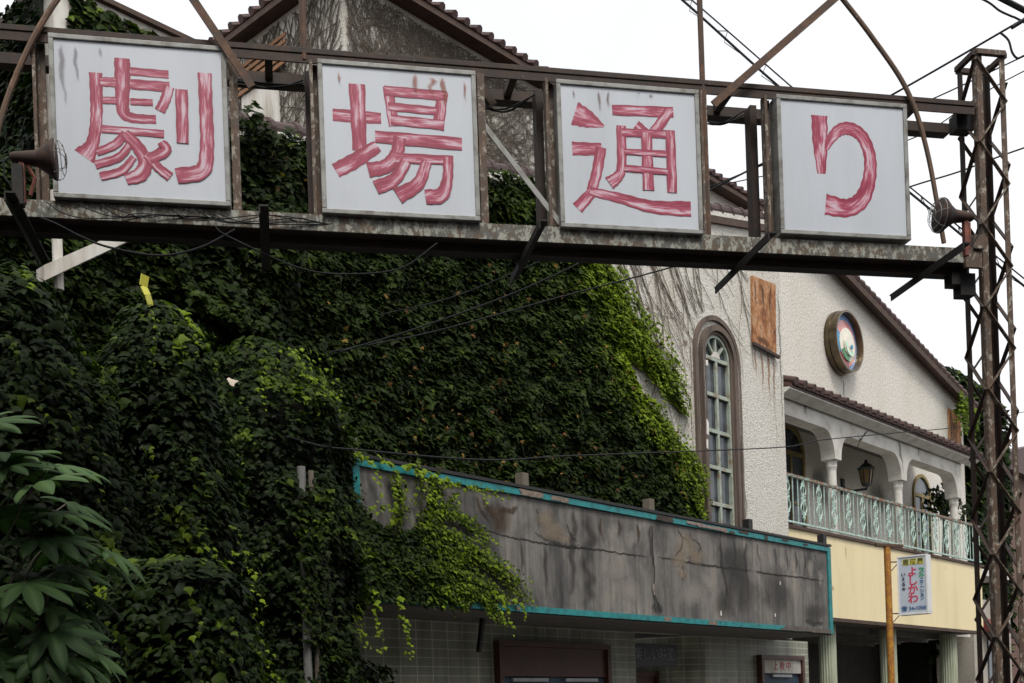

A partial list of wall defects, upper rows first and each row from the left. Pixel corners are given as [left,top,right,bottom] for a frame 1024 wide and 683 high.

damp [477,498,517,529]
damp [537,516,603,591]
crack [489,528,821,612]